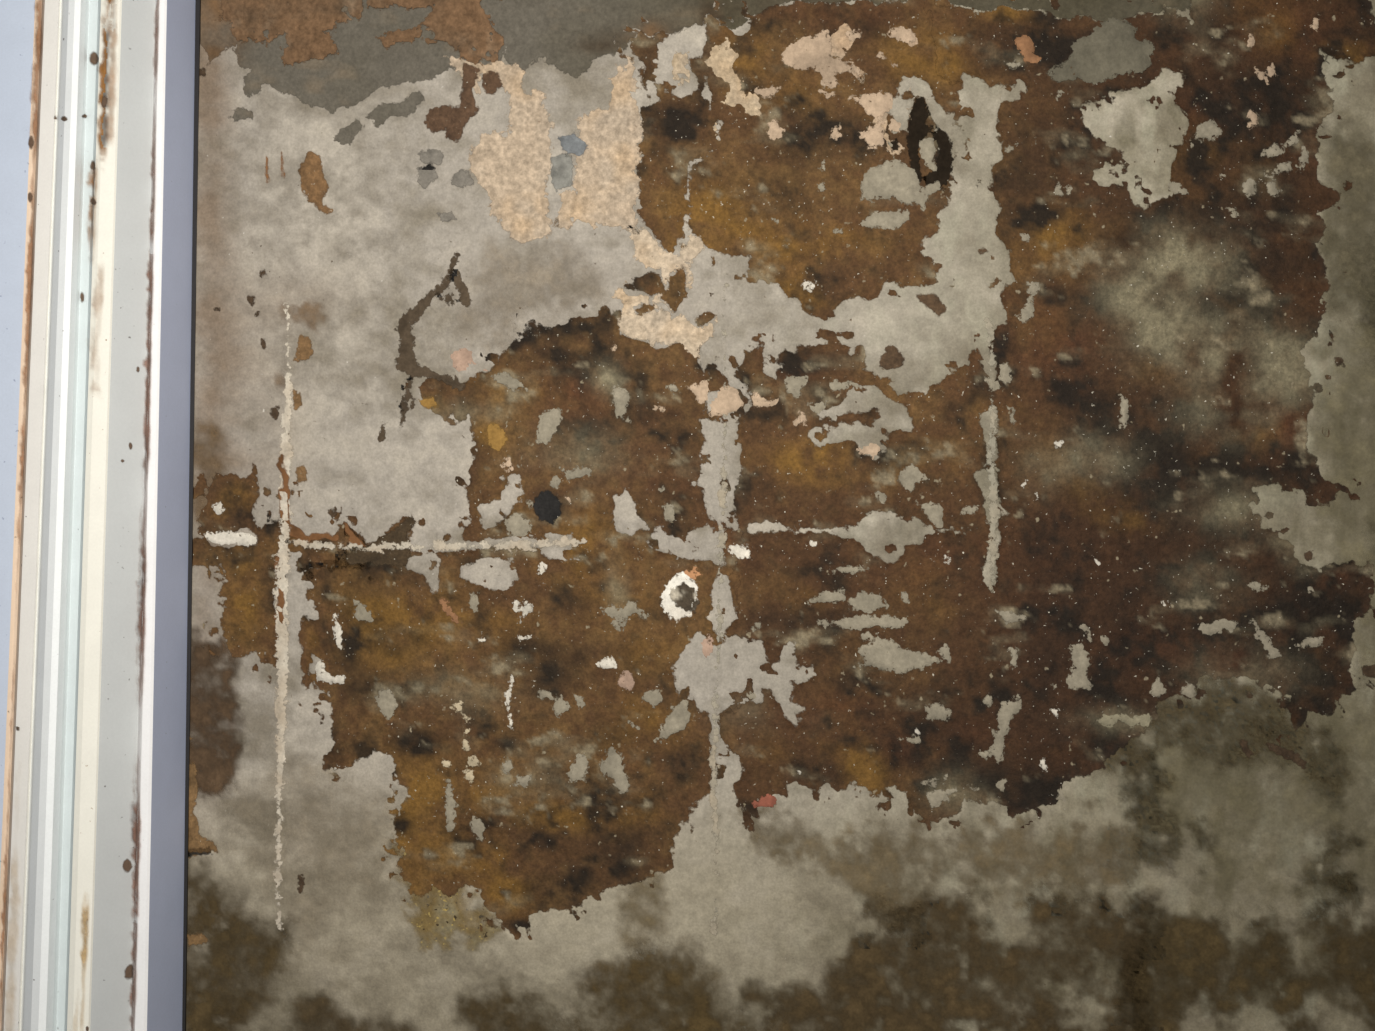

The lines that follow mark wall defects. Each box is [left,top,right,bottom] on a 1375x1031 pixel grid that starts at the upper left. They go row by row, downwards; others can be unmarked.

water stain [1324,135,1375,302]
peeling [193,0,1375,940]
water stain [186,877,289,1031]
water stain [295,996,412,1031]
water stain [405,881,500,948]
water stain [459,991,550,1031]
water stain [582,676,1375,1031]